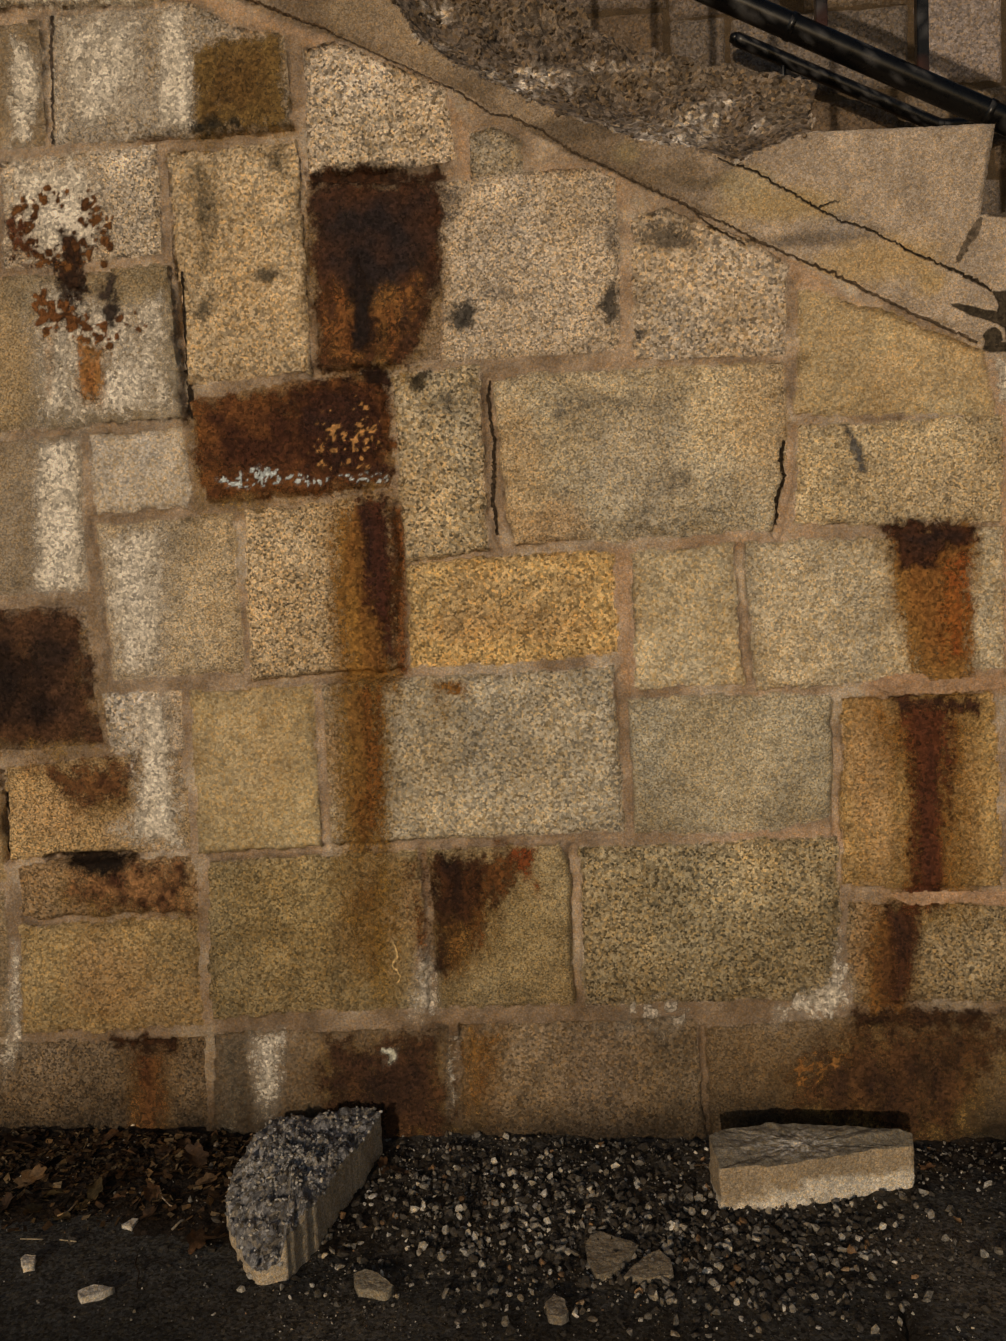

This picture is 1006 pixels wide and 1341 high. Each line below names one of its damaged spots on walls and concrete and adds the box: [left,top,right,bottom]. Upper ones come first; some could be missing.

crack [47,16,55,144]
spalling [390,0,818,166]
crack [249,0,1006,351]
rust [6,185,147,402]
crack [180,271,193,419]
rust [187,161,539,1006]
rust [0,608,140,815]
rust [62,851,198,921]
rust [785,515,1006,1142]